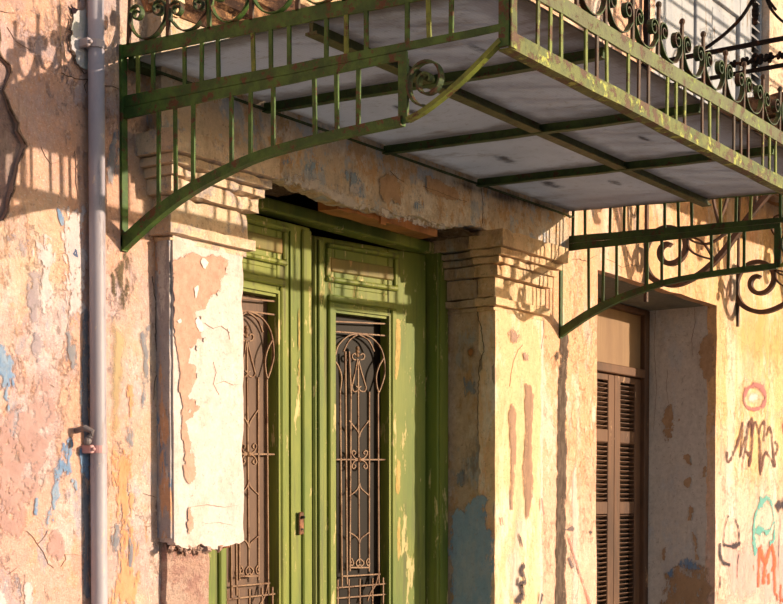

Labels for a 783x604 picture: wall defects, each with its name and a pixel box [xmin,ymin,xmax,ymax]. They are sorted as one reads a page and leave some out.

flaking render [68,5,88,74]
flaking render [0,29,28,221]
peeling [0,344,60,539]
peeling [45,438,90,561]
flaking render [168,544,230,556]
peeling [173,252,230,496]
peeling [448,495,495,604]
crack [476,307,484,436]
damp [509,383,534,519]
peeling [662,404,680,441]